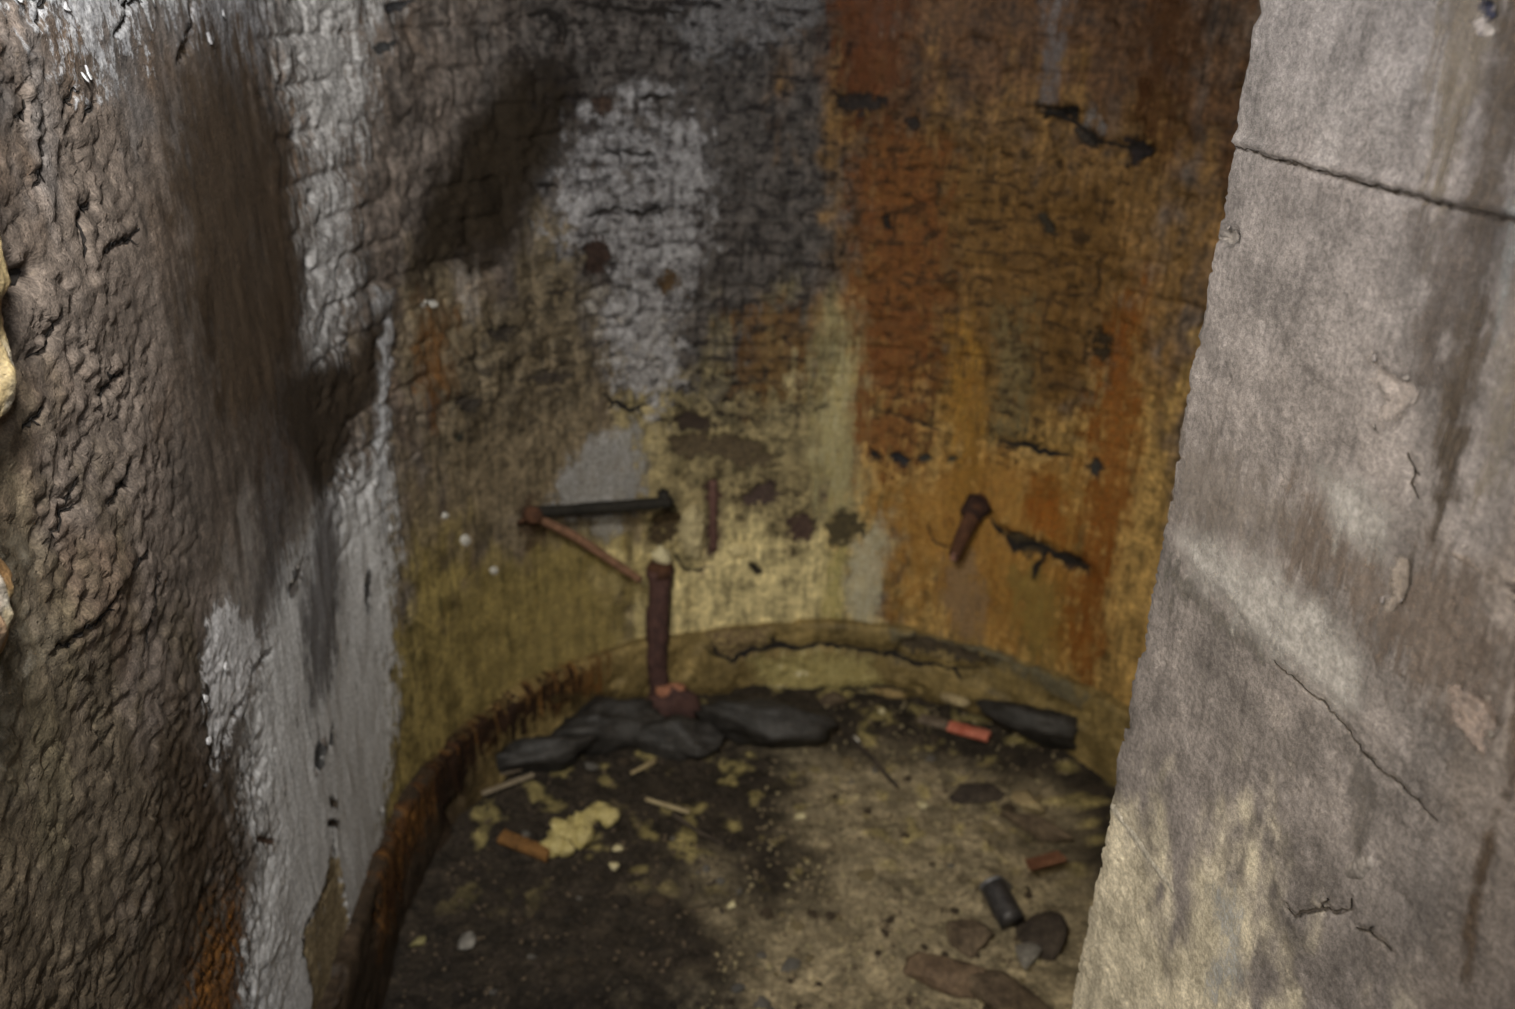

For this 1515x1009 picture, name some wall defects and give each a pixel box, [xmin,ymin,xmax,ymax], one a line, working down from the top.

crack [15,86,96,185]
spalling [1041,102,1102,148]
spalling [1123,135,1156,168]
crack [1234,146,1515,222]
crack [76,202,140,257]
crack [9,268,21,285]
damp [162,0,396,707]
crack [97,370,123,407]
corrosion [655,682,686,698]
crack [702,635,987,692]
crack [1274,660,1438,821]
crack [1288,898,1391,951]